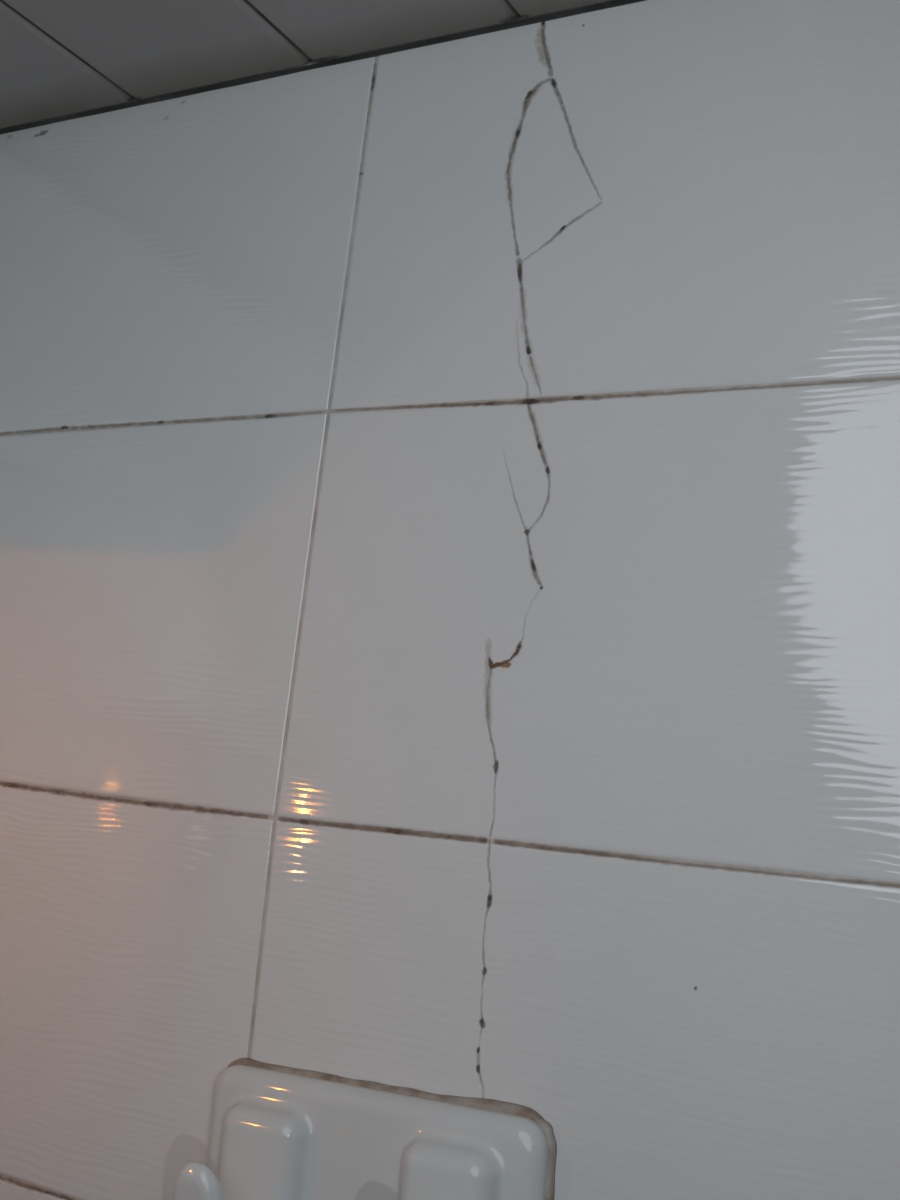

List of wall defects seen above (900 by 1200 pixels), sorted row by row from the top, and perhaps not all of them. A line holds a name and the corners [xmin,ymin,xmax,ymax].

crack [513,21,571,148]
crack [516,250,524,301]
crack [524,529,543,589]
crack [476,1019,484,1072]